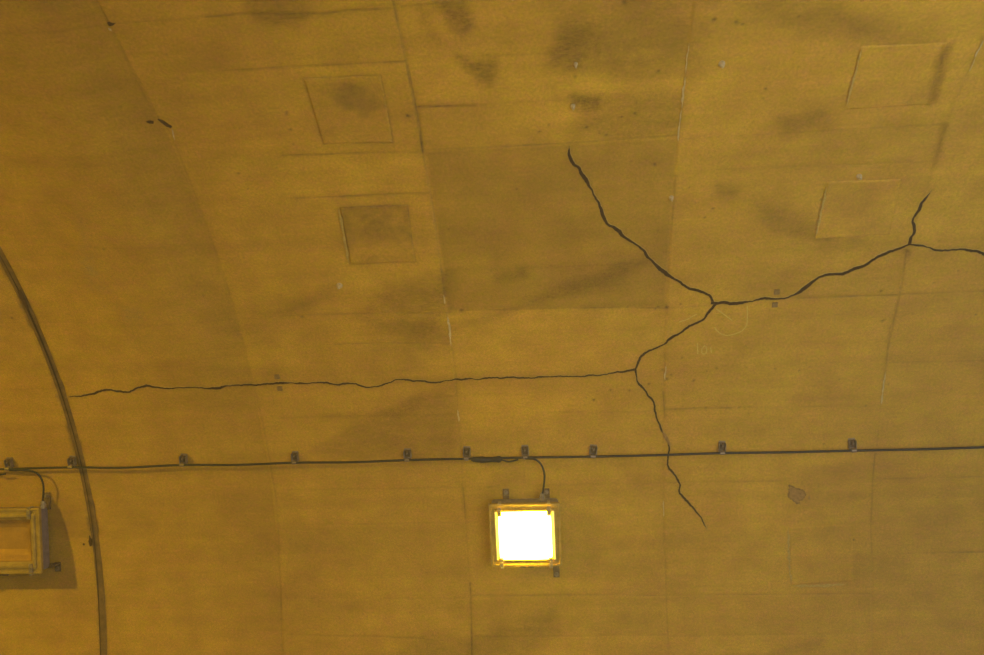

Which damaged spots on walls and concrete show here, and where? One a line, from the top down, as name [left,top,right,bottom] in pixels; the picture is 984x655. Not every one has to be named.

crack [66,145,984,530]